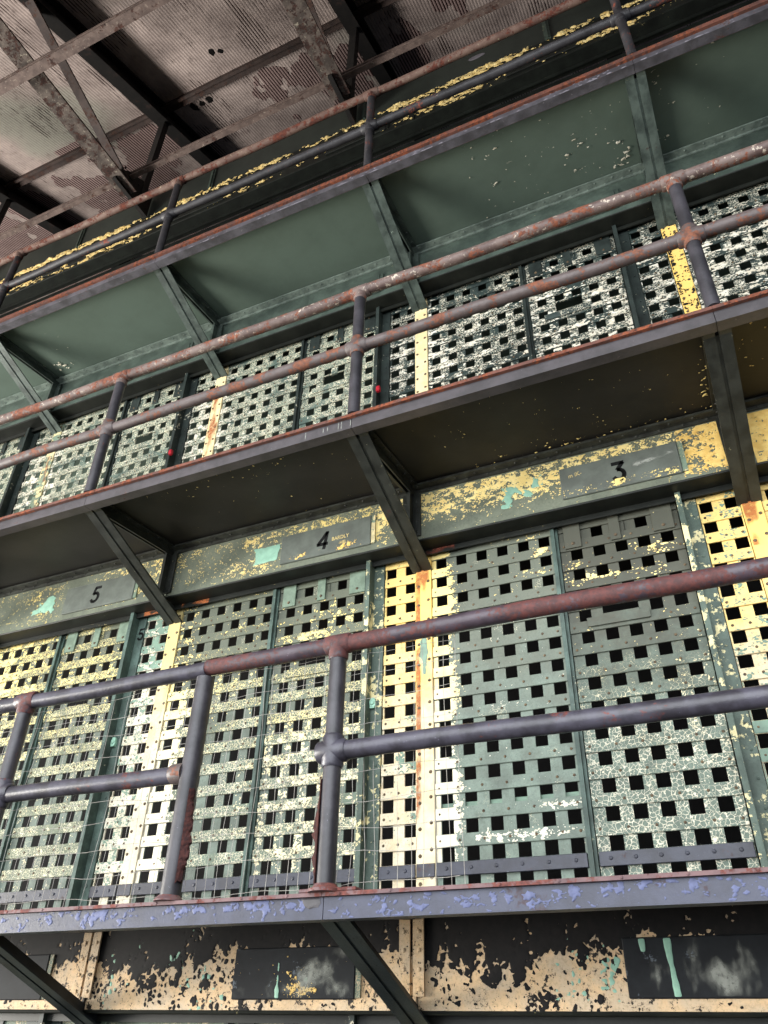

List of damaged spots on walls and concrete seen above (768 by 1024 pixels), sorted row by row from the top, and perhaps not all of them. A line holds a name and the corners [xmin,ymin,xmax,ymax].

peeling [0,0,654,295]
peeling [428,272,634,388]
peeling [421,421,728,528]
corrosion [416,570,428,622]
peeling [431,551,464,618]
peeling [433,635,465,727]
peeling [135,784,177,883]
corrosion [174,788,196,884]
corrosion [311,777,322,884]
peeling [435,745,600,863]
peeling [1,899,338,1010]
peeling [328,876,768,1012]